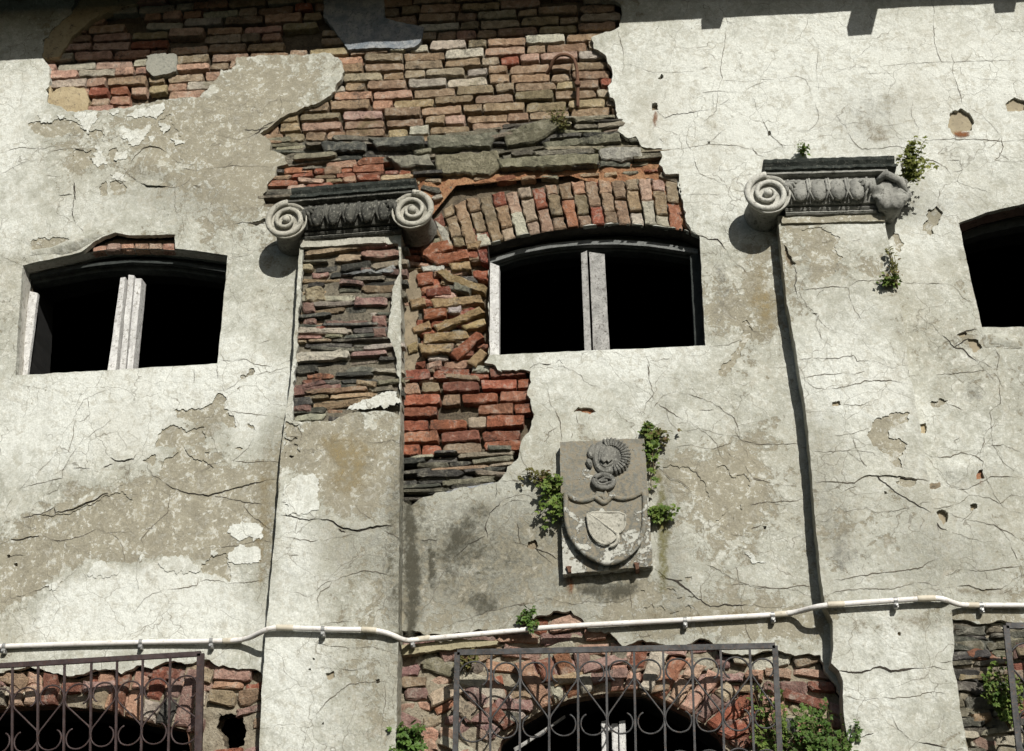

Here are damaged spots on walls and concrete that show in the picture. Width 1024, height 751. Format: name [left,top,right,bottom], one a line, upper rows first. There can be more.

crack [6,99,282,257]
crack [618,1,1024,272]
flaking render [28,0,692,505]
peeling [158,521,264,582]
crack [1,389,557,614]
peeling [282,473,320,516]
crack [529,360,594,442]
crack [636,265,1024,641]
peeling [867,412,927,488]
flaking render [0,661,263,751]
flaking render [401,614,843,751]
flaking render [952,621,1024,751]